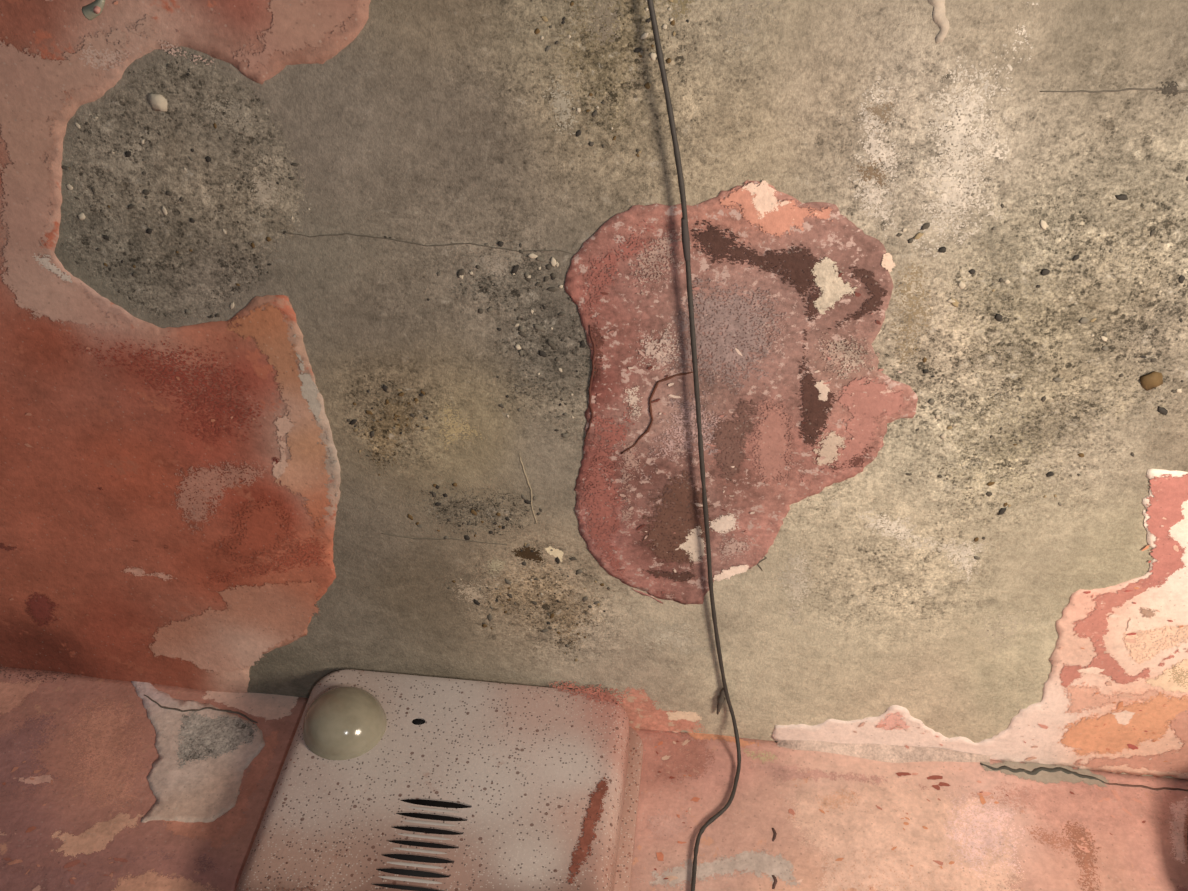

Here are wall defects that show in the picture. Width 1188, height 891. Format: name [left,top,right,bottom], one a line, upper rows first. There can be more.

spalling [534,0,694,148]
crack [1040,81,1188,96]
crack [277,229,575,255]
peeling [0,0,371,861]
spalling [347,384,429,476]
peeling [437,156,1188,661]
spalling [408,483,542,540]
peeling [622,469,1188,878]
crack [980,761,1188,791]